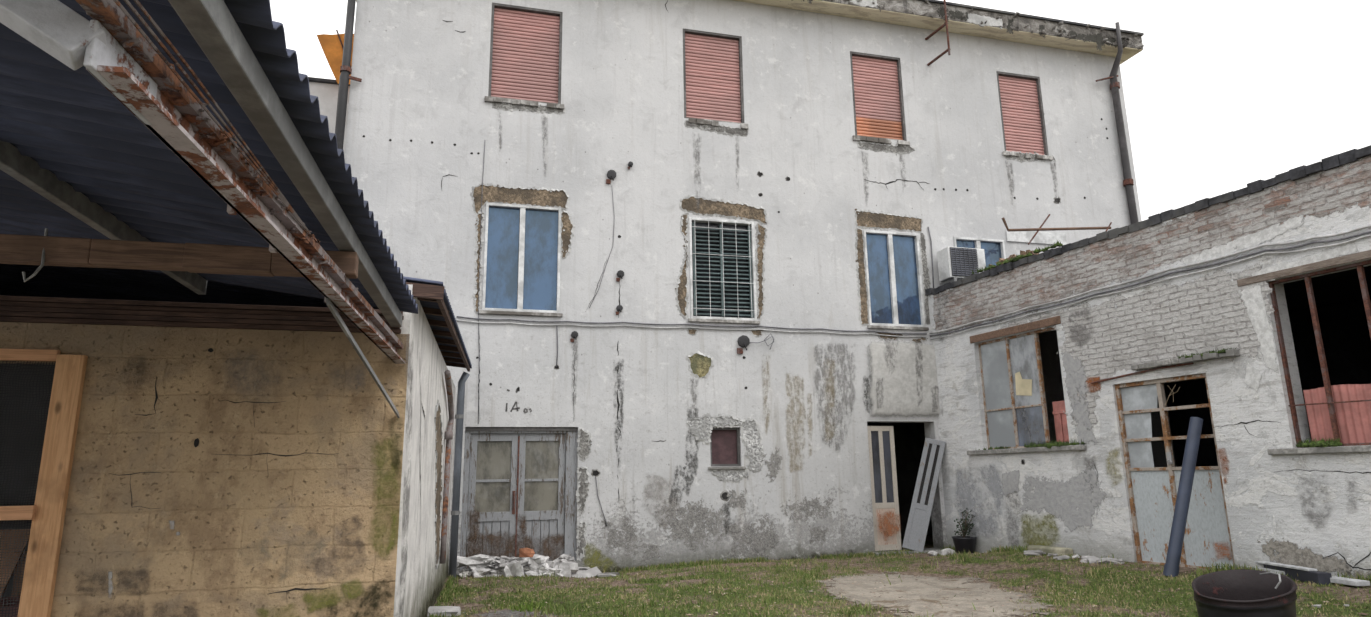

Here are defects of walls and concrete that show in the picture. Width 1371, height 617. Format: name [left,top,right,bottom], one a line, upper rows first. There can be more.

spalling [912,0,1144,49]
spalling [857,141,915,155]
spalling [1002,151,1056,163]
spalling [470,183,576,314]
spalling [675,171,780,381]
flaking render [854,155,1371,445]
spalling [575,413,832,562]
spalling [1002,459,1106,533]
crack [1325,552,1371,577]